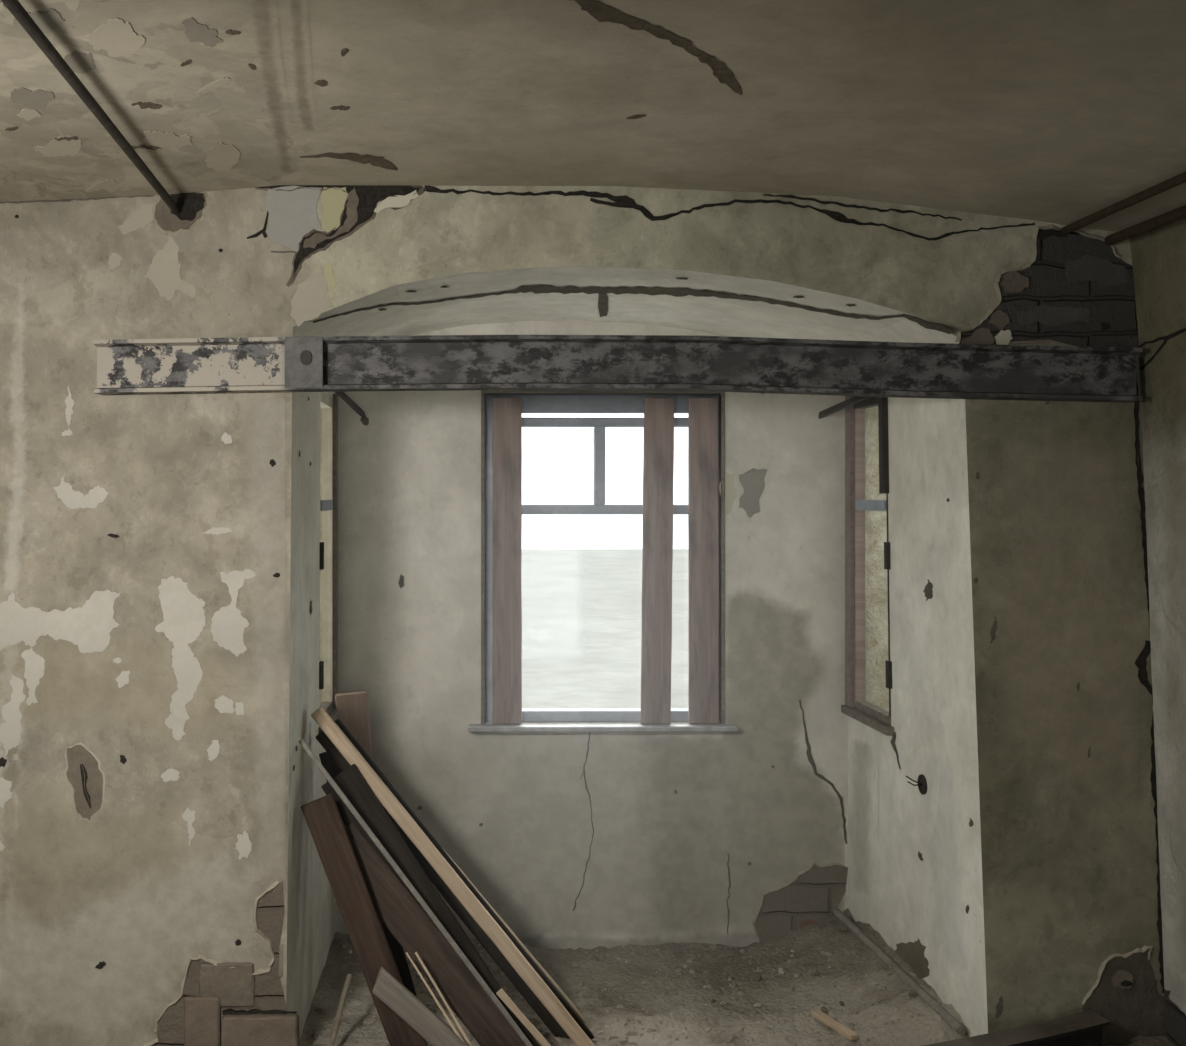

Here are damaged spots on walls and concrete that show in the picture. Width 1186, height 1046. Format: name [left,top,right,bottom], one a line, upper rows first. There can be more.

crack [575,0,742,95]
crack [313,285,955,334]
crack [247,153,1035,287]
spalling [955,224,1139,348]
peeling [0,590,130,808]
spalling [64,743,105,822]
peeling [155,569,256,741]
crack [799,700,848,844]
damp [909,746,980,981]
damp [982,413,1186,986]
crack [1134,328,1186,993]
spalling [143,881,299,1046]